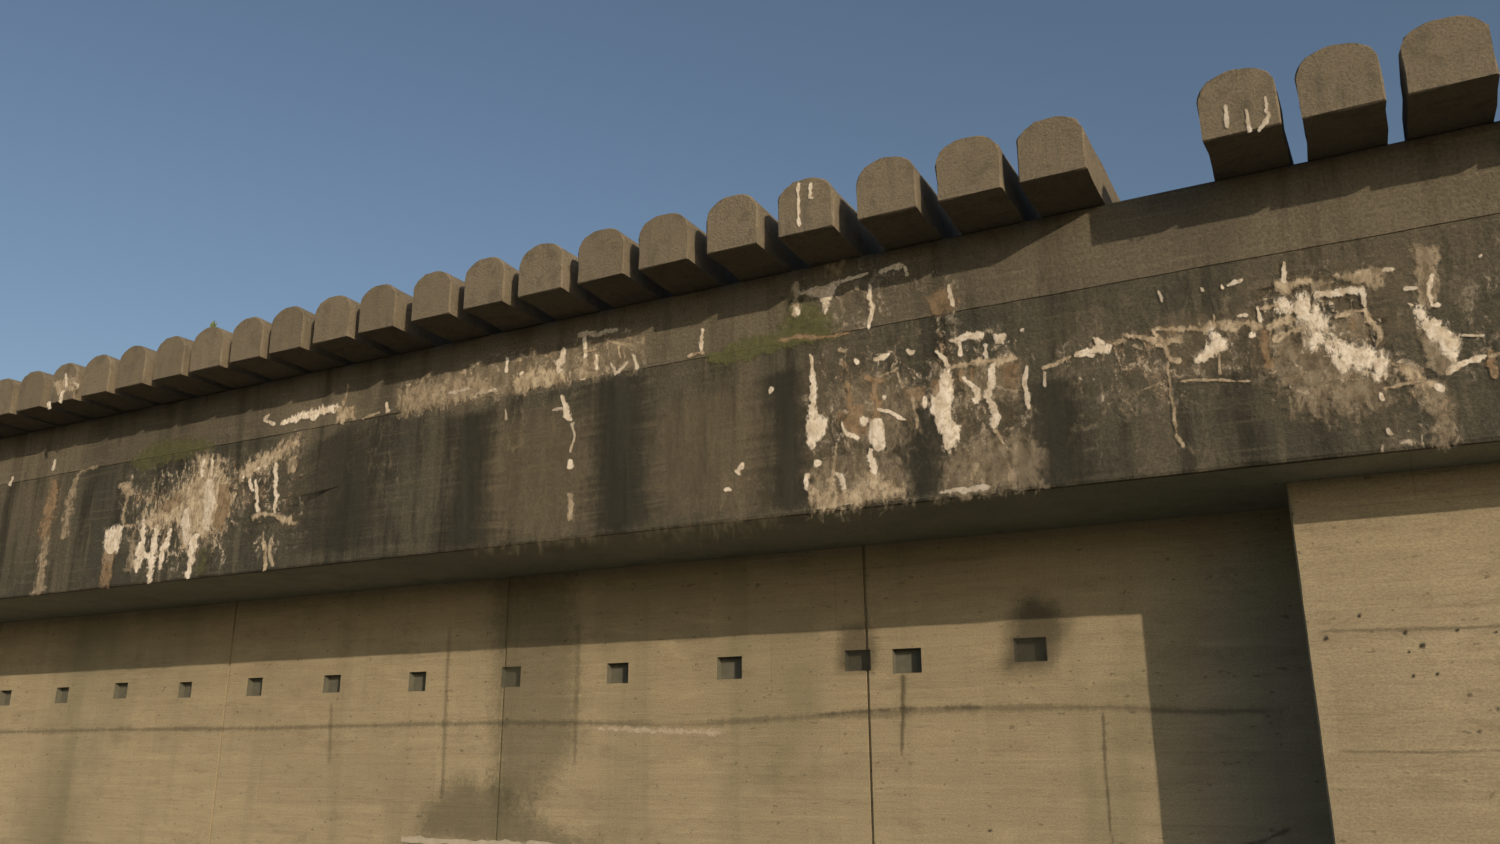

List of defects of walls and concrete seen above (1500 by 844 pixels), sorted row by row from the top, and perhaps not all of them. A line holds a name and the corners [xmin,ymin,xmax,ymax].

spalling [397,328,644,418]
spalling [791,258,868,317]
leakage [1154,261,1448,445]
leakage [1403,246,1485,363]
spalling [97,450,245,588]
leakage [444,411,496,546]
leakage [585,370,648,529]
spalling [803,442,906,512]